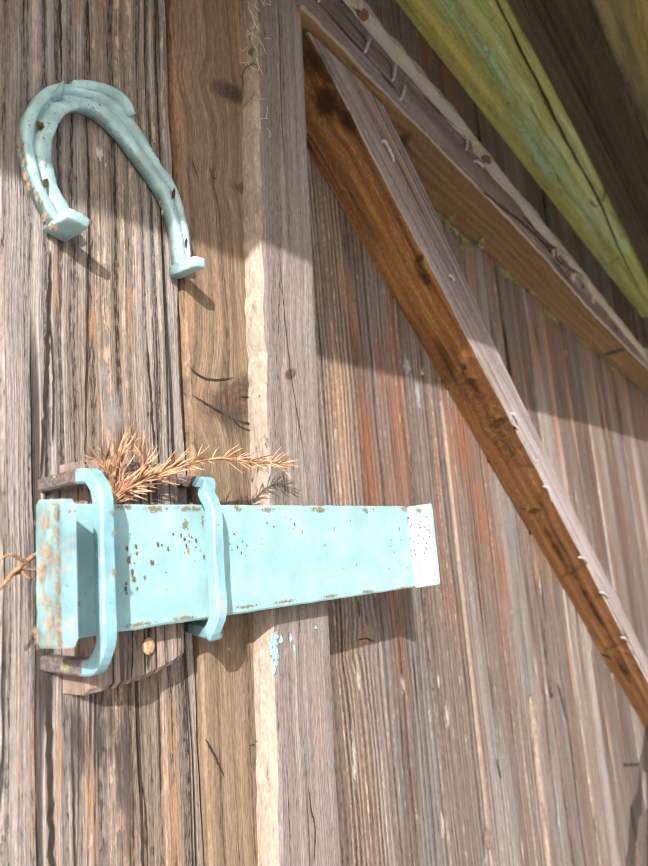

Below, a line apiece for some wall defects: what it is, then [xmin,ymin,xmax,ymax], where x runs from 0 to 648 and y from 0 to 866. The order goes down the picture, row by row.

crack [154,0,162,64]
crack [496,0,638,286]
crack [479,189,587,286]
crack [147,348,155,451]
crack [177,300,250,441]
peeling [269,632,295,677]
crack [205,740,224,776]